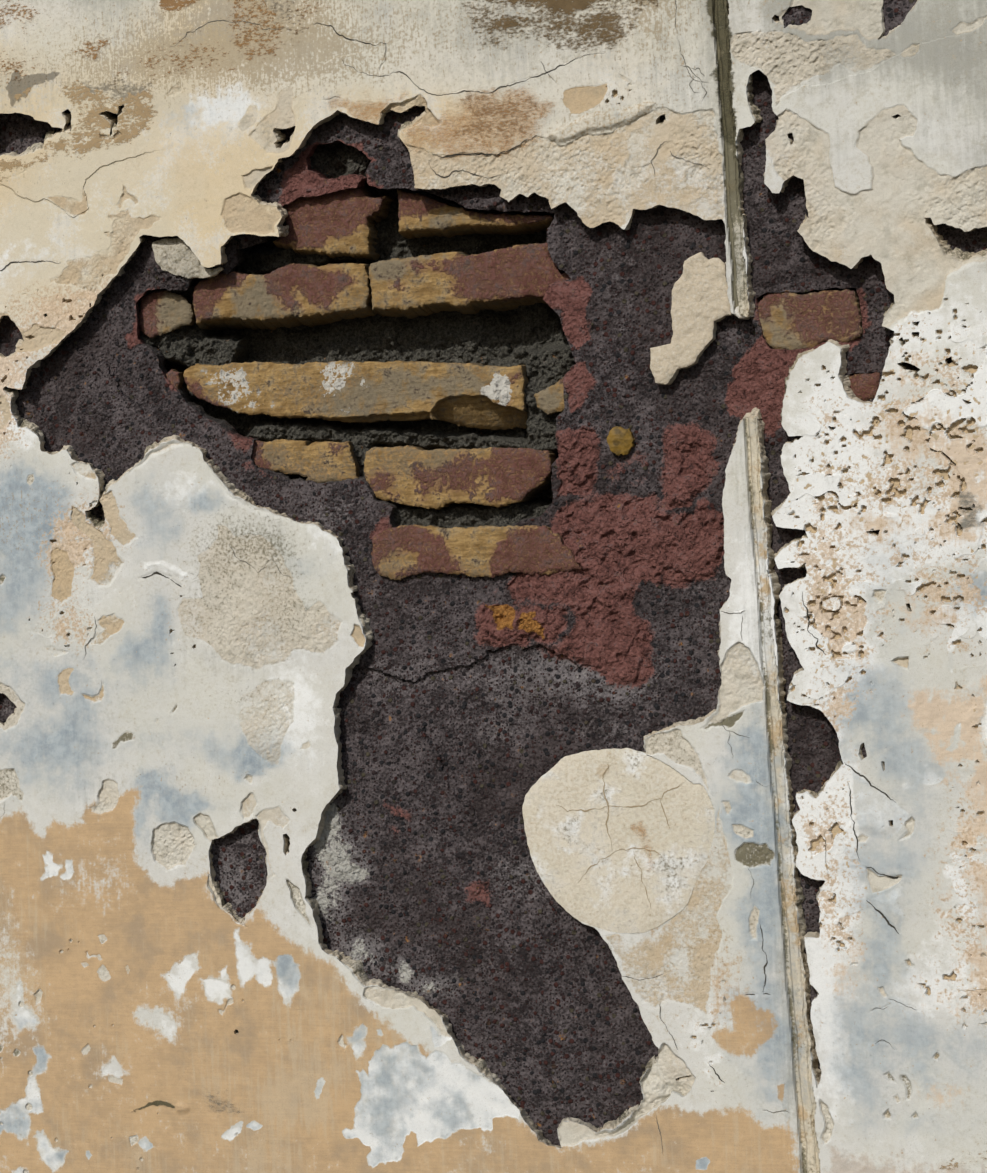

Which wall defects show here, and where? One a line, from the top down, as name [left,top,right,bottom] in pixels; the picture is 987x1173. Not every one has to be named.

flaking render [563,74,638,116]
spalling [730,0,987,561]
spalling [0,86,766,1172]
flaking render [891,657,910,672]
peeling [947,571,987,673]
spalling [772,562,902,935]
crack [557,765,680,907]
flaking render [732,825,775,869]